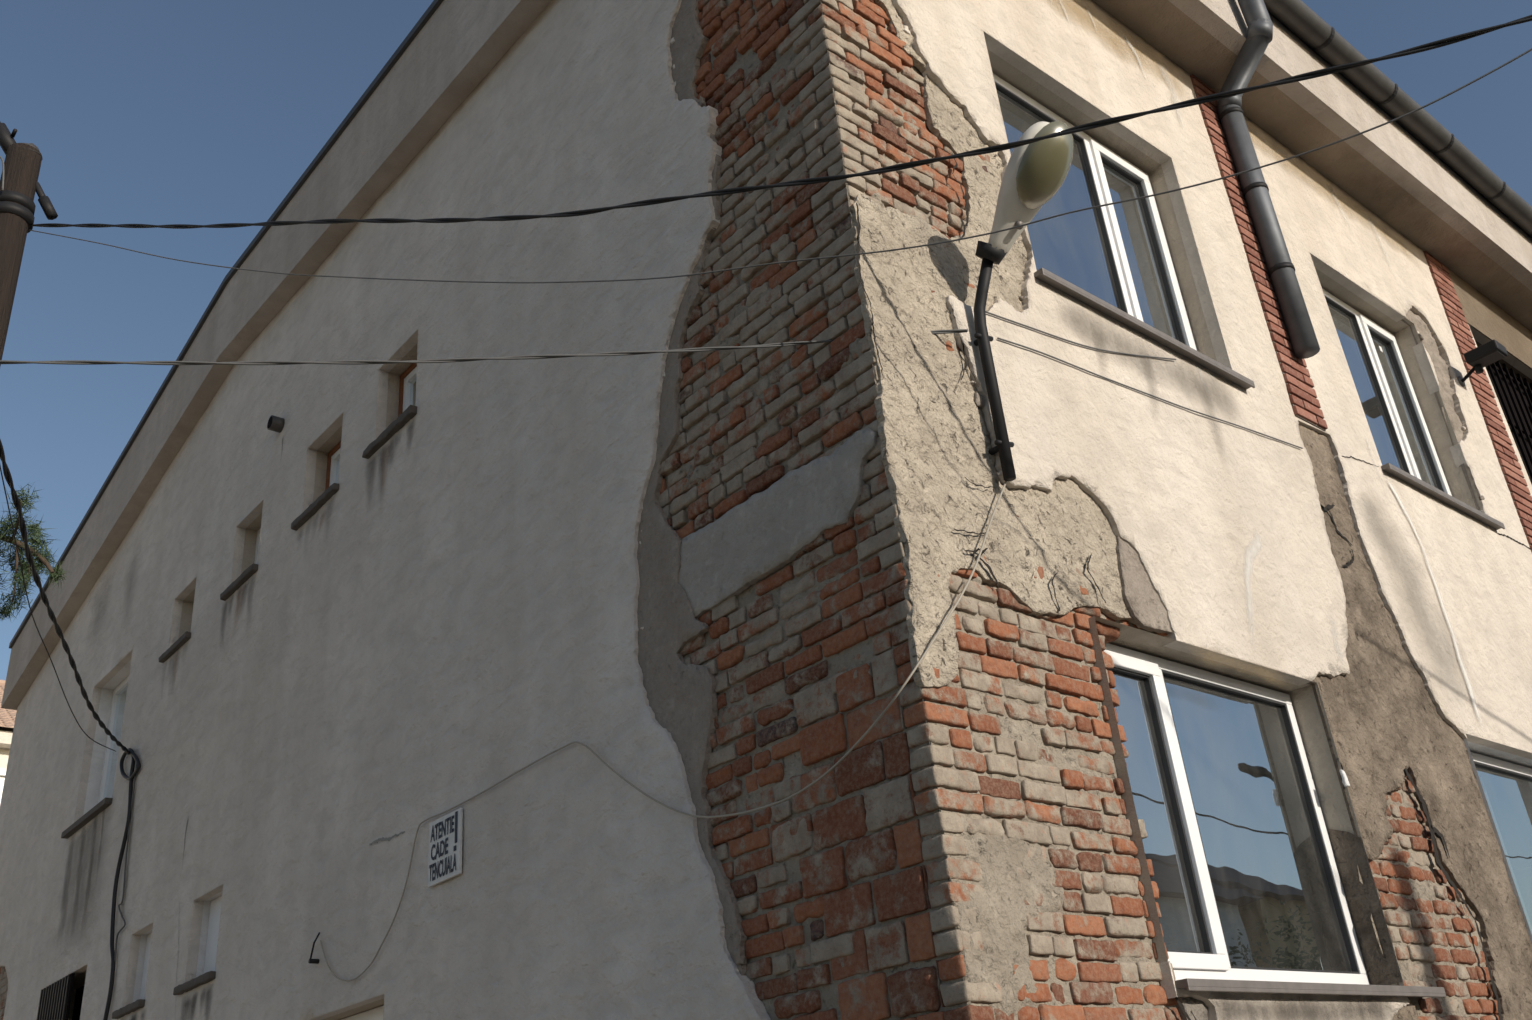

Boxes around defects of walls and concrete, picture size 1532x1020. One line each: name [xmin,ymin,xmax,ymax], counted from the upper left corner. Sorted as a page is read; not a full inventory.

flaking render [0,967,8,1020]
flaking render [637,0,1208,1020]
flaking render [1298,424,1532,1020]
flaking render [1401,310,1472,445]